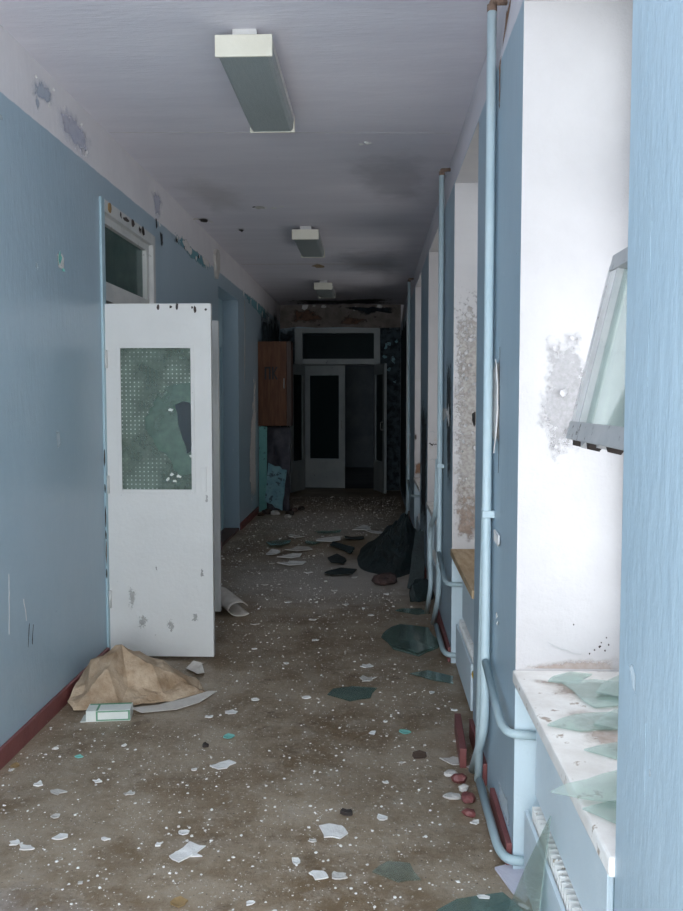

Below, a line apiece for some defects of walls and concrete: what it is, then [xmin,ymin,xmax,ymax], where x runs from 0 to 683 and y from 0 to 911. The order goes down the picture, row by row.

peeling [443,302,477,536]